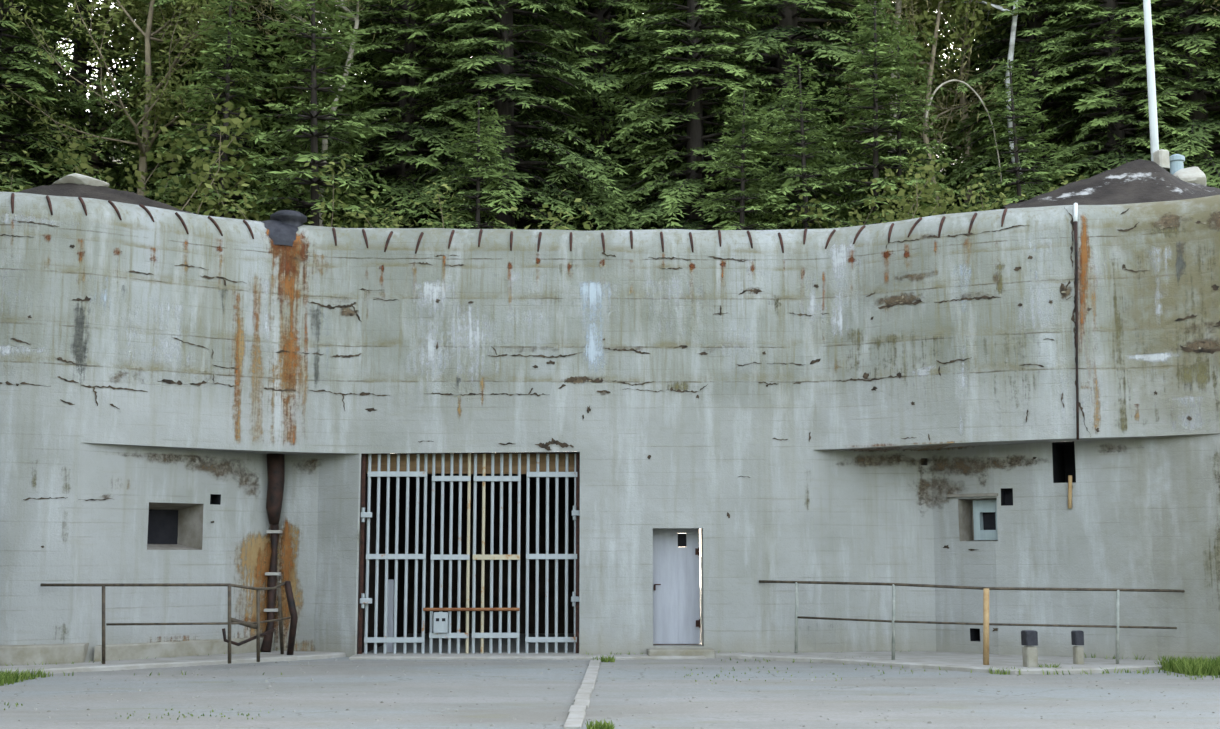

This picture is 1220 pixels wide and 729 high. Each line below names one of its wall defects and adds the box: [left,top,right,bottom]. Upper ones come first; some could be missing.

damp [73,308,86,373]
rust [232,229,323,444]
spalling [871,292,921,320]
rust [1080,216,1096,343]
spalling [1154,215,1180,229]
rust [237,519,303,637]